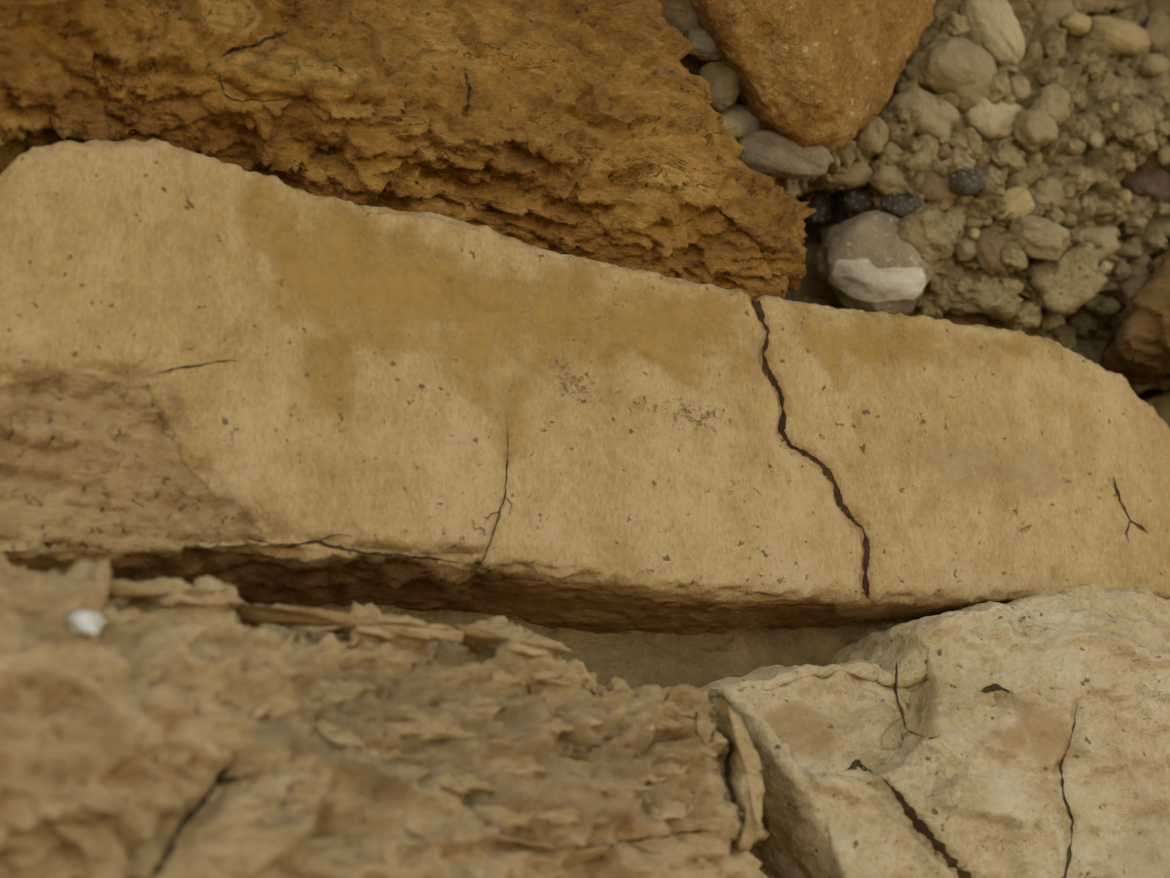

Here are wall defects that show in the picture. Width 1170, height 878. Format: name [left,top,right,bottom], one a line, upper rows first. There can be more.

crack [250,415,512,570]
crack [742,290,870,599]
crack [1113,477,1148,542]
crack [844,759,971,878]
crack [1059,703,1078,878]